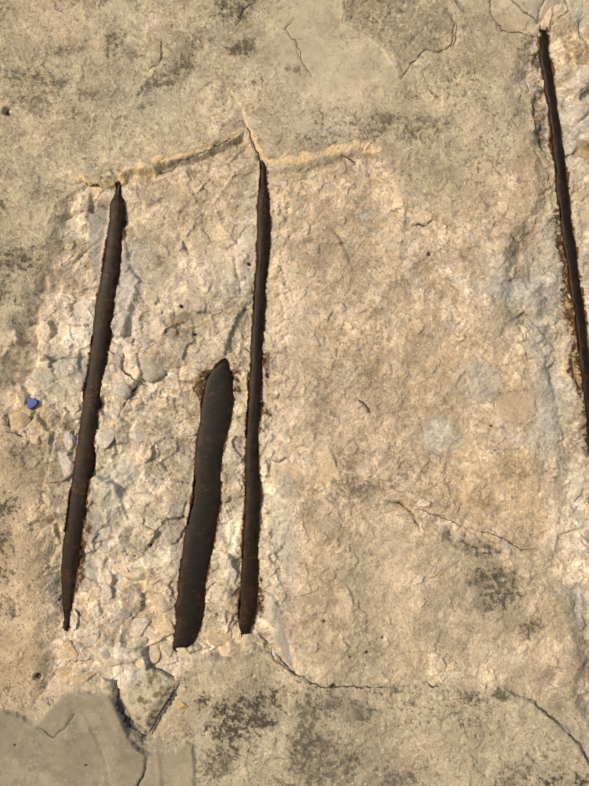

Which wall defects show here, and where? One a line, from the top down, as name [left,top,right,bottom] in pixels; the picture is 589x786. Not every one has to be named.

crack [160,126,260,174]
crack [489,0,544,36]
rust [528,24,559,186]
rust [57,271,121,628]
spalling [0,127,261,738]
rust [192,347,251,550]
rust [251,244,271,481]
spalling [227,0,589,749]
crack [389,501,534,551]
rust [552,203,589,456]
crack [253,628,399,690]
crack [510,691,589,763]